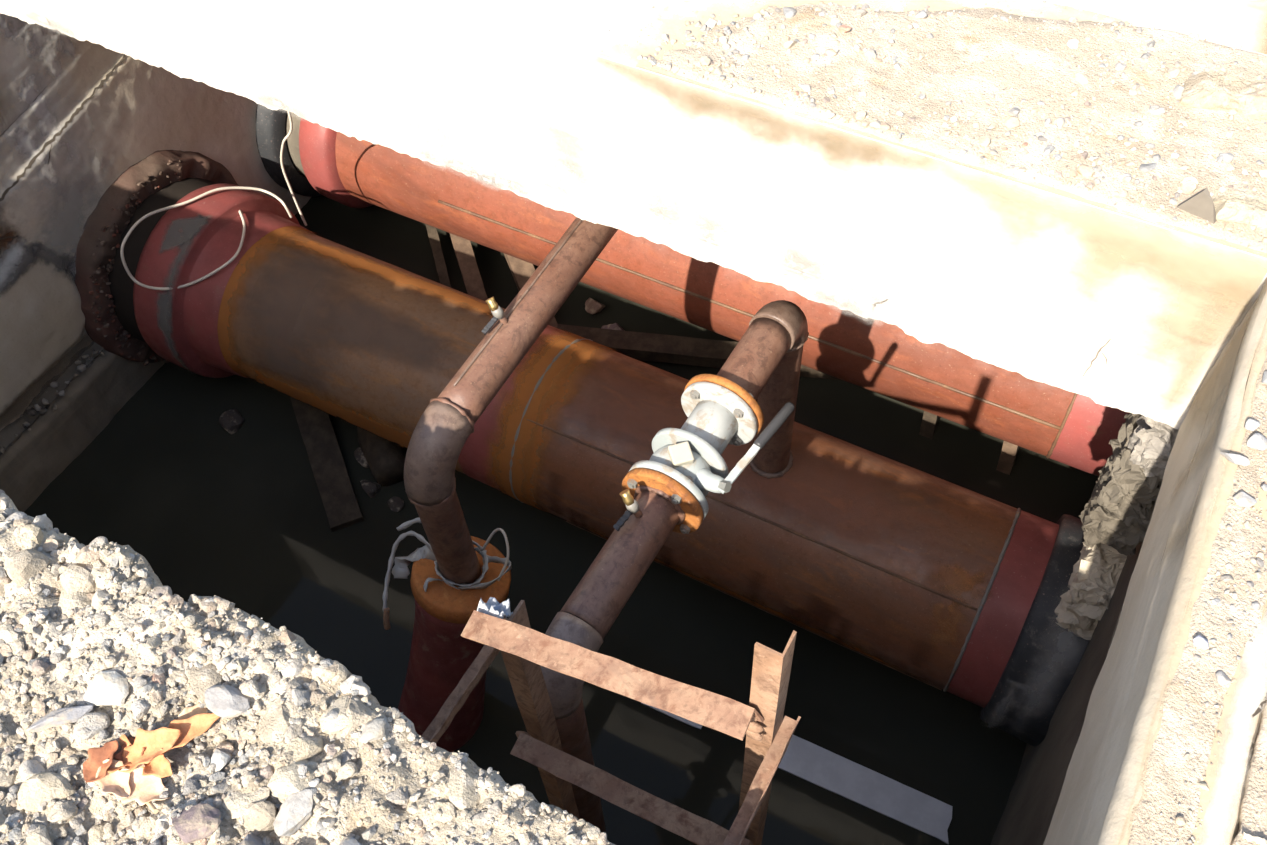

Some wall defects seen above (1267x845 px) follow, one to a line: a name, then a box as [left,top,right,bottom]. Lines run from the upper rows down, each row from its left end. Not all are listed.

water stain [634,73,920,163]
water stain [332,97,1004,351]
water stain [245,252,443,380]
crack [1083,339,1111,376]
water stain [964,179,1267,462]
spalling [1079,413,1178,556]